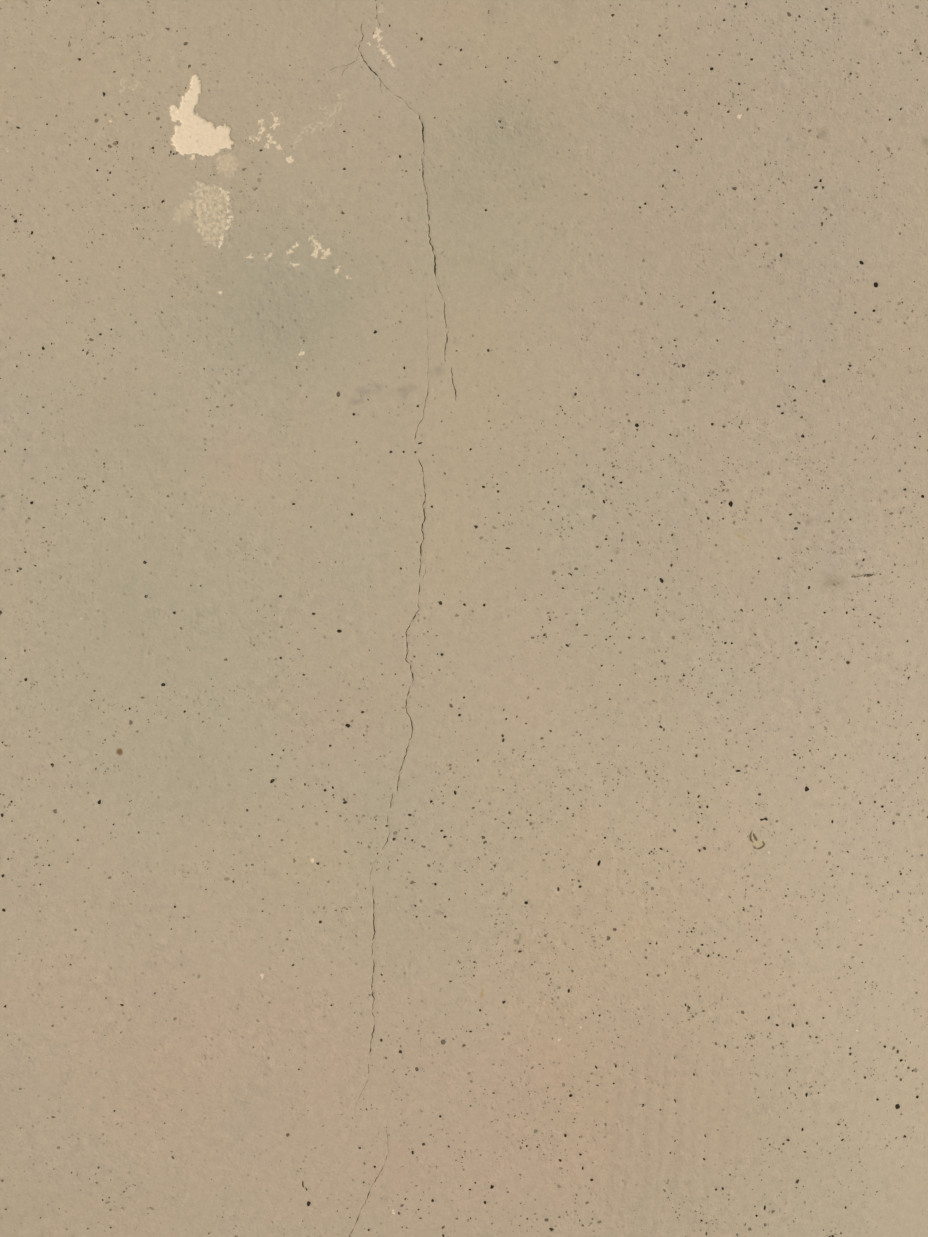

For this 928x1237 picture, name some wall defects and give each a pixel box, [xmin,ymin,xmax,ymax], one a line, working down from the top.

peeling [167,73,296,249]
crack [331,0,456,1095]